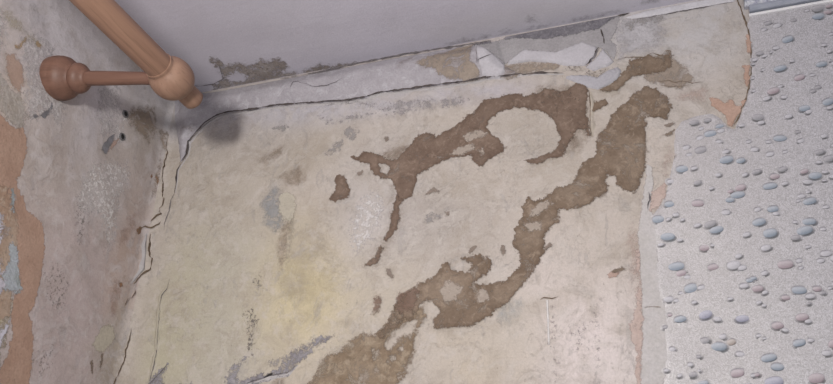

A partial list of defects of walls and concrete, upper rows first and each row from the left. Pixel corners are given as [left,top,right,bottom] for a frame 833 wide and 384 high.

flaking render [6,54,24,92]
flaking render [473,16,662,90]
crack [125,40,564,305]
flaking render [0,115,45,384]
crack [113,333,131,384]
crack [247,365,298,384]